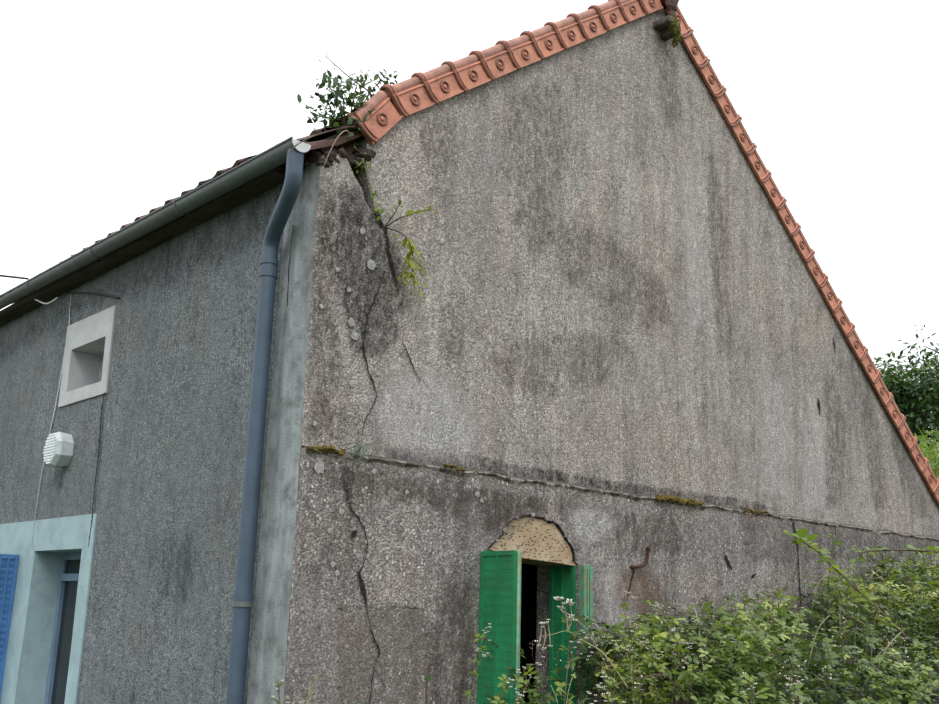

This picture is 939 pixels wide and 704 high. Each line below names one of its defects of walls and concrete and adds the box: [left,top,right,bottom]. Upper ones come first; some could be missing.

damp [310,189,405,437]
crack [356,210,397,435]
damp [682,164,731,345]
crack [347,467,386,704]
damp [332,471,543,534]
damp [386,447,569,483]
damp [560,499,682,554]
damp [581,377,789,510]